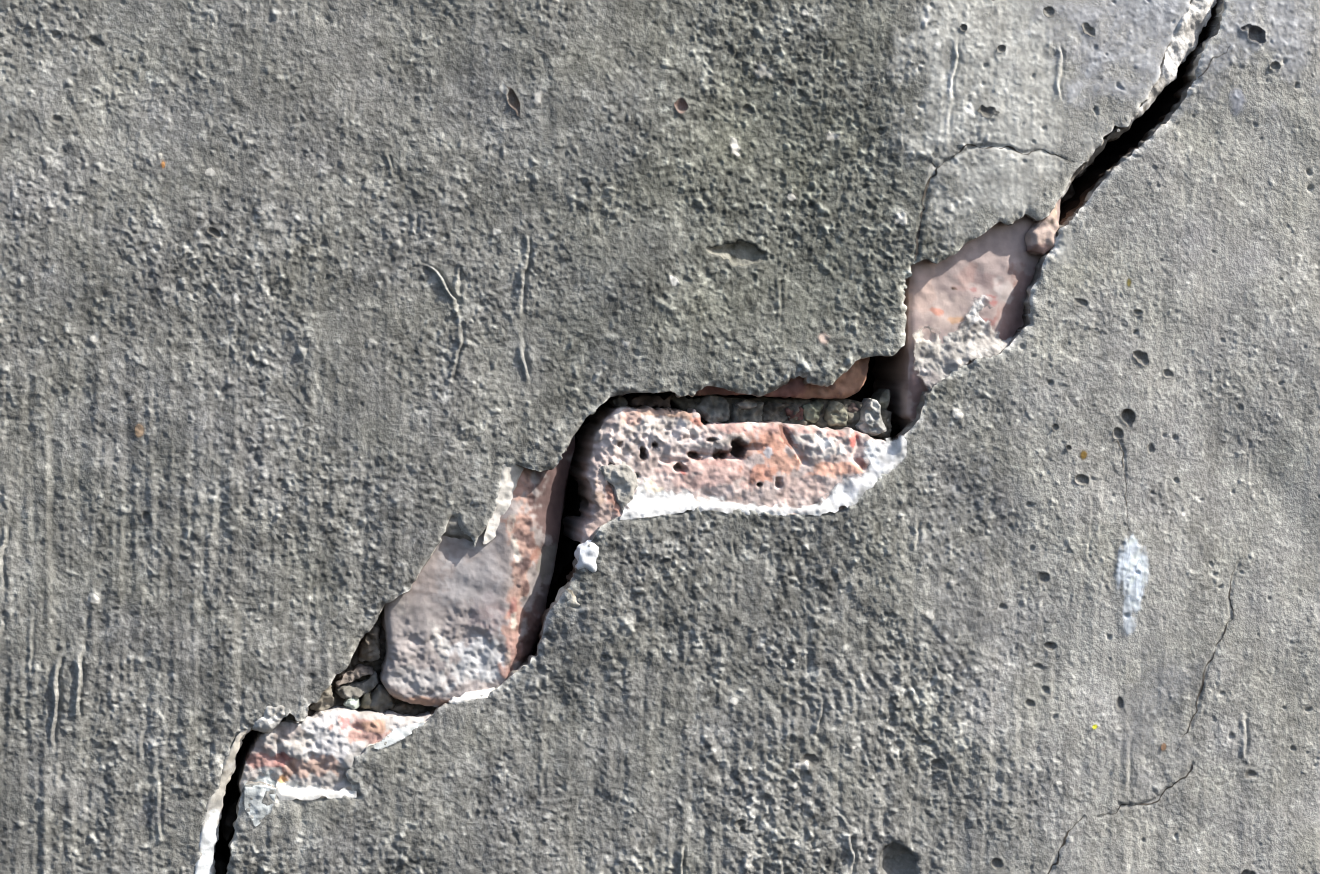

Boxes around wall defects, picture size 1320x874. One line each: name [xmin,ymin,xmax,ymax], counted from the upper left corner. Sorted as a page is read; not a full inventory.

crack [915,0,1230,260]
crack [547,393,691,598]
spalling [226,0,1225,874]
crack [845,356,875,402]
crack [891,421,900,433]
crack [1117,440,1129,529]
crack [195,725,252,874]
crack [1048,560,1239,874]